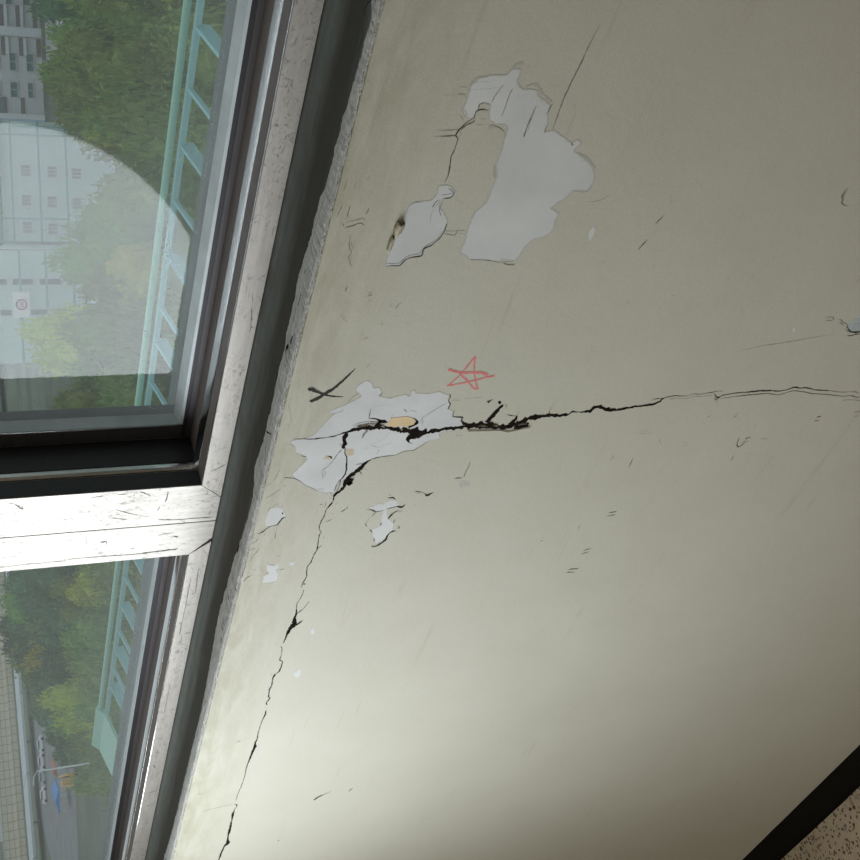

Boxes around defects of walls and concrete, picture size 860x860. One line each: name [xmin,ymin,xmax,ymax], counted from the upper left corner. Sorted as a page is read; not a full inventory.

peeling [385,61,596,267]
spalling [164,0,385,860]
spalling [290,381,464,495]
peeling [365,495,404,547]
crack [218,387,859,860]